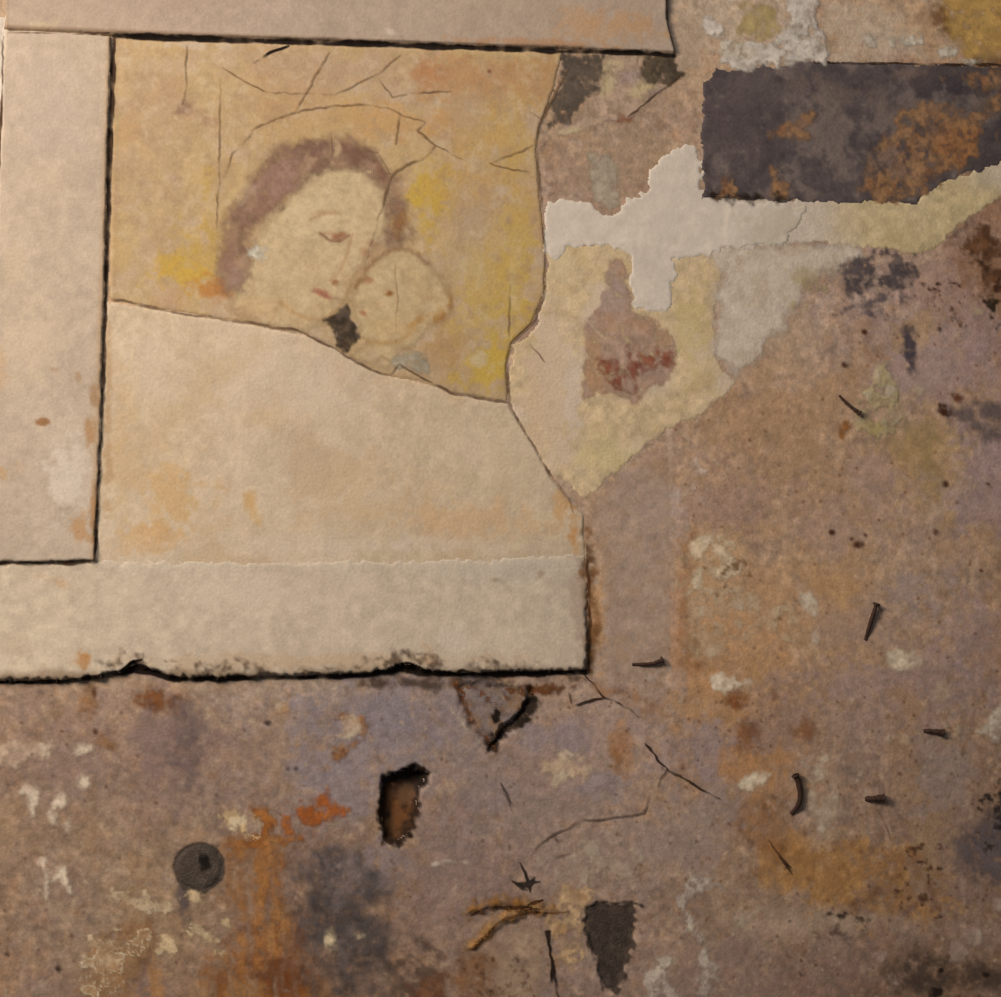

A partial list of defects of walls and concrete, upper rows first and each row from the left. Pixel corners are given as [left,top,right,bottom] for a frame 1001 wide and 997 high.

flaking render [557,55,665,136]
crack [0,32,684,565]
flaking render [508,70,1001,498]
crack [0,546,621,706]
spalling [376,763,429,847]
crack [500,782,511,804]
crack [539,743,720,857]
rust [215,794,349,997]
crack [469,862,565,997]
spalling [544,884,643,994]
crack [778,854,792,873]